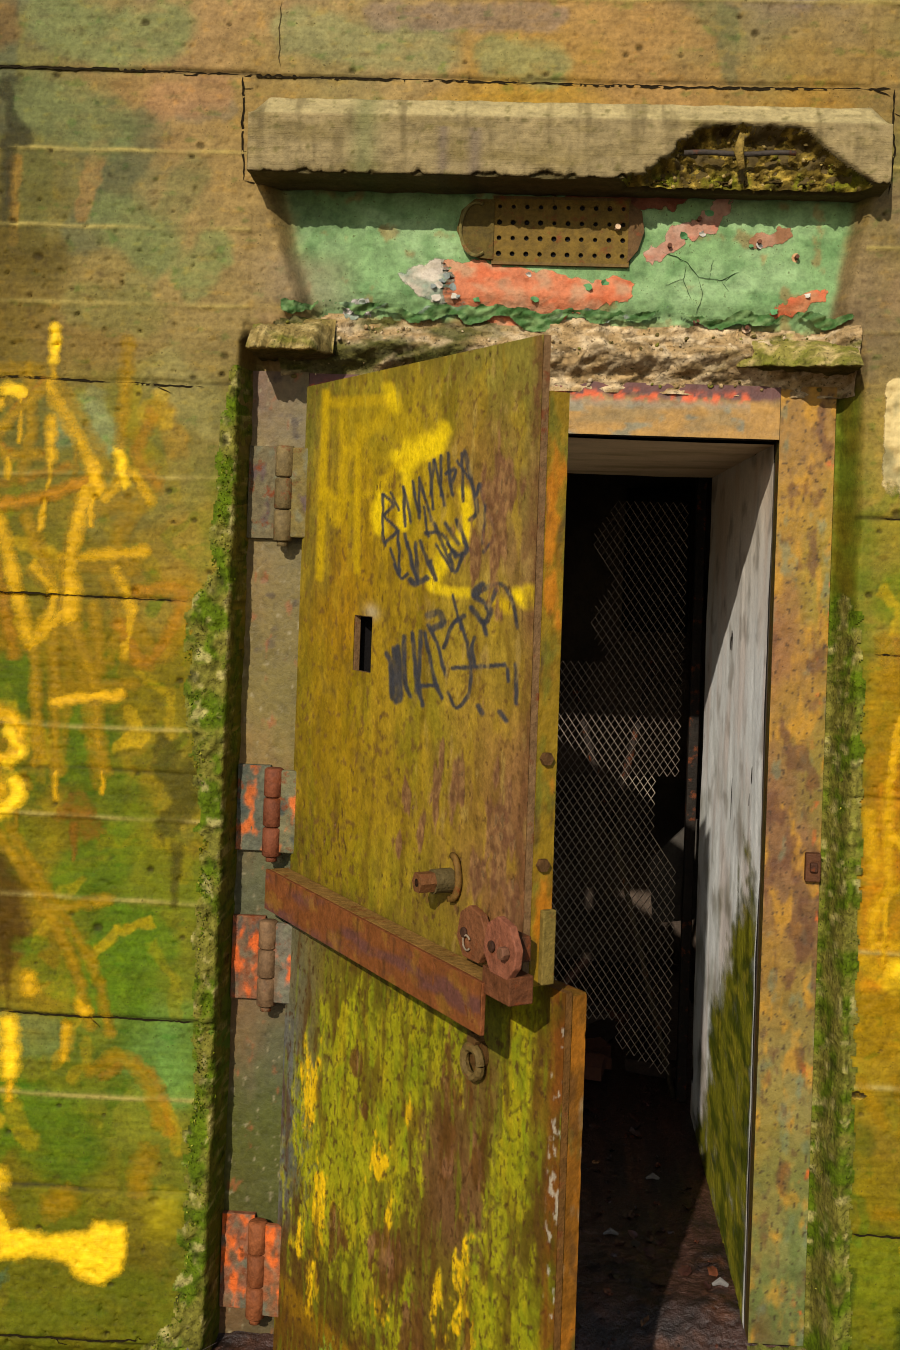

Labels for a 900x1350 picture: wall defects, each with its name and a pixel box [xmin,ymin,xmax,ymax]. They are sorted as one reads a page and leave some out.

spalling [552,122,873,265]
spalling [273,258,862,399]
crack [663,252,738,313]